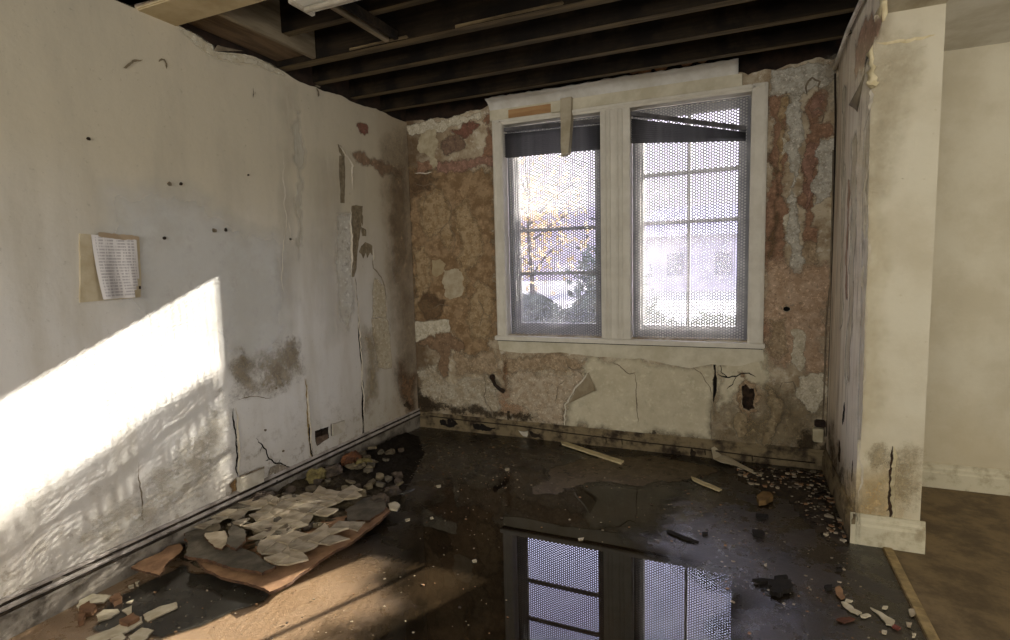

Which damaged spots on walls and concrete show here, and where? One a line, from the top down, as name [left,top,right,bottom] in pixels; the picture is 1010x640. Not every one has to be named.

flaking render [336,113,497,357]
flaking render [763,0,888,499]
mould [234,341,299,392]
peeling [501,352,587,425]
crack [612,362,639,421]
crack [693,364,812,439]
crack [257,439,289,467]
damp [722,392,917,524]
crack [886,446,898,518]